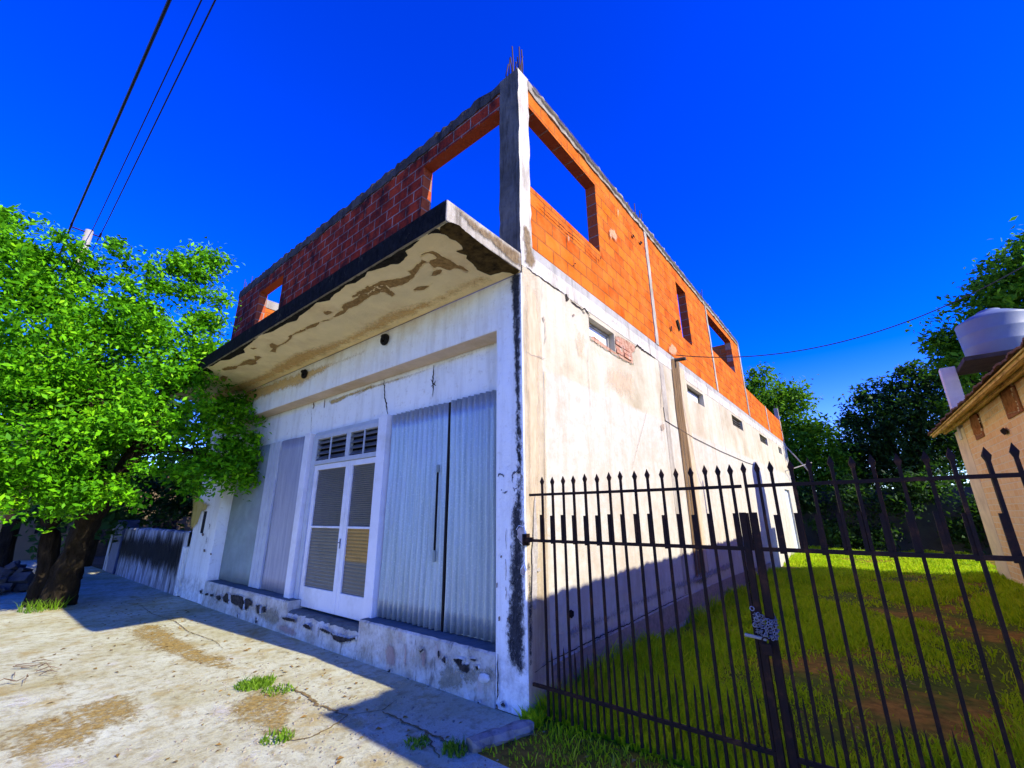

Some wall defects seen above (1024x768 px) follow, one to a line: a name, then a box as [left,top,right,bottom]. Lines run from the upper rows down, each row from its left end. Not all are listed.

peeling [219,249,470,382]
flaking render [590,335,636,365]
leakage [169,200,547,675]
flaking render [199,589,266,624]
flaking render [281,616,357,644]
flaking render [438,651,480,674]